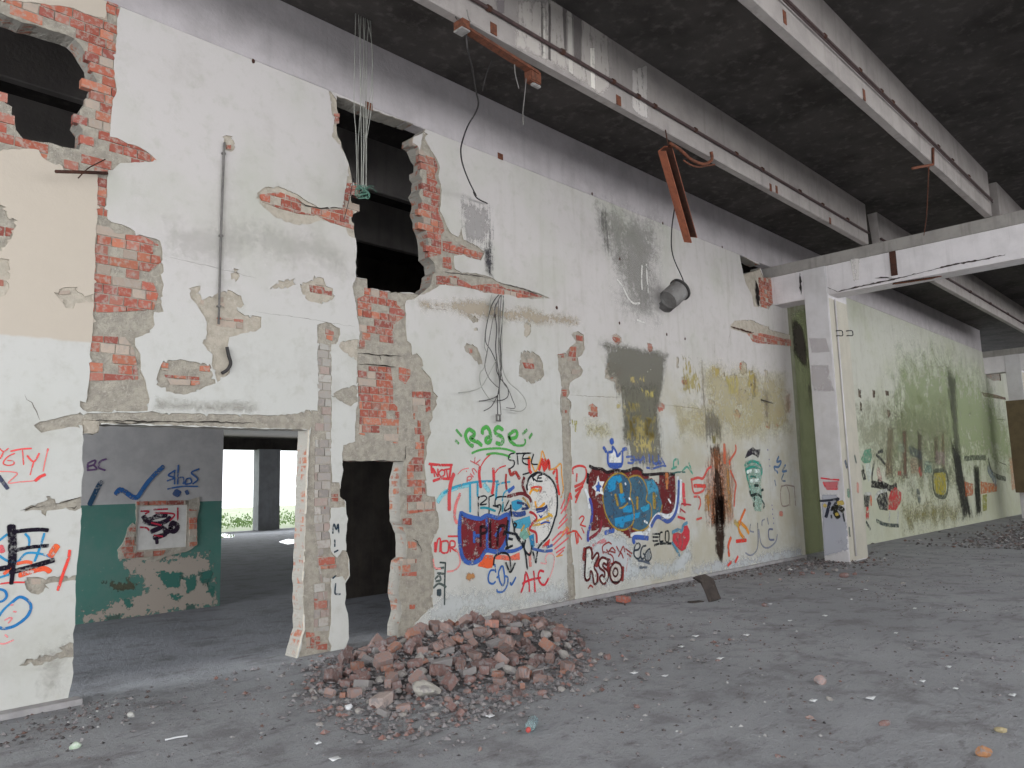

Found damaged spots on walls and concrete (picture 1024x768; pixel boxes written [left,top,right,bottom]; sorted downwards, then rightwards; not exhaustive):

flaking render [0,0,547,688]
water stain [604,343,665,466]
flaking render [730,320,791,346]
crack [829,255,1004,292]
flaking render [557,332,584,601]
water stain [951,444,981,518]